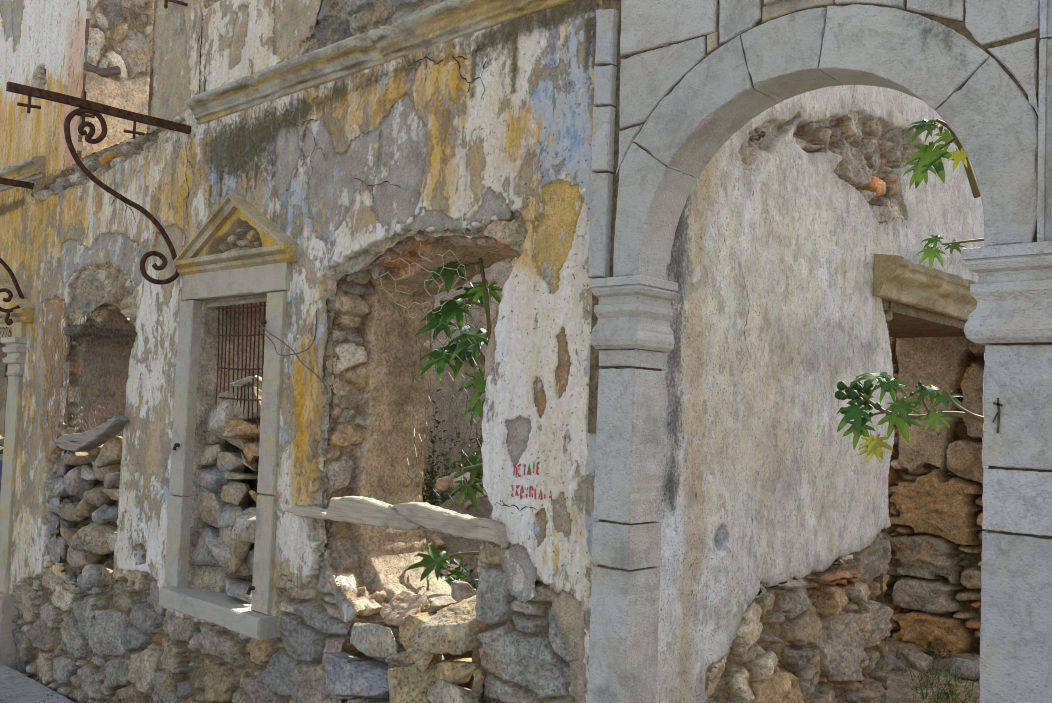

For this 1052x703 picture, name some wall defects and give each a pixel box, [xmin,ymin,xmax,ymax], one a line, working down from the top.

peeling [0,0,25,53]
flaking render [272,0,447,64]
peeling [34,0,191,202]
crack [404,48,489,98]
flaking render [11,93,587,703]